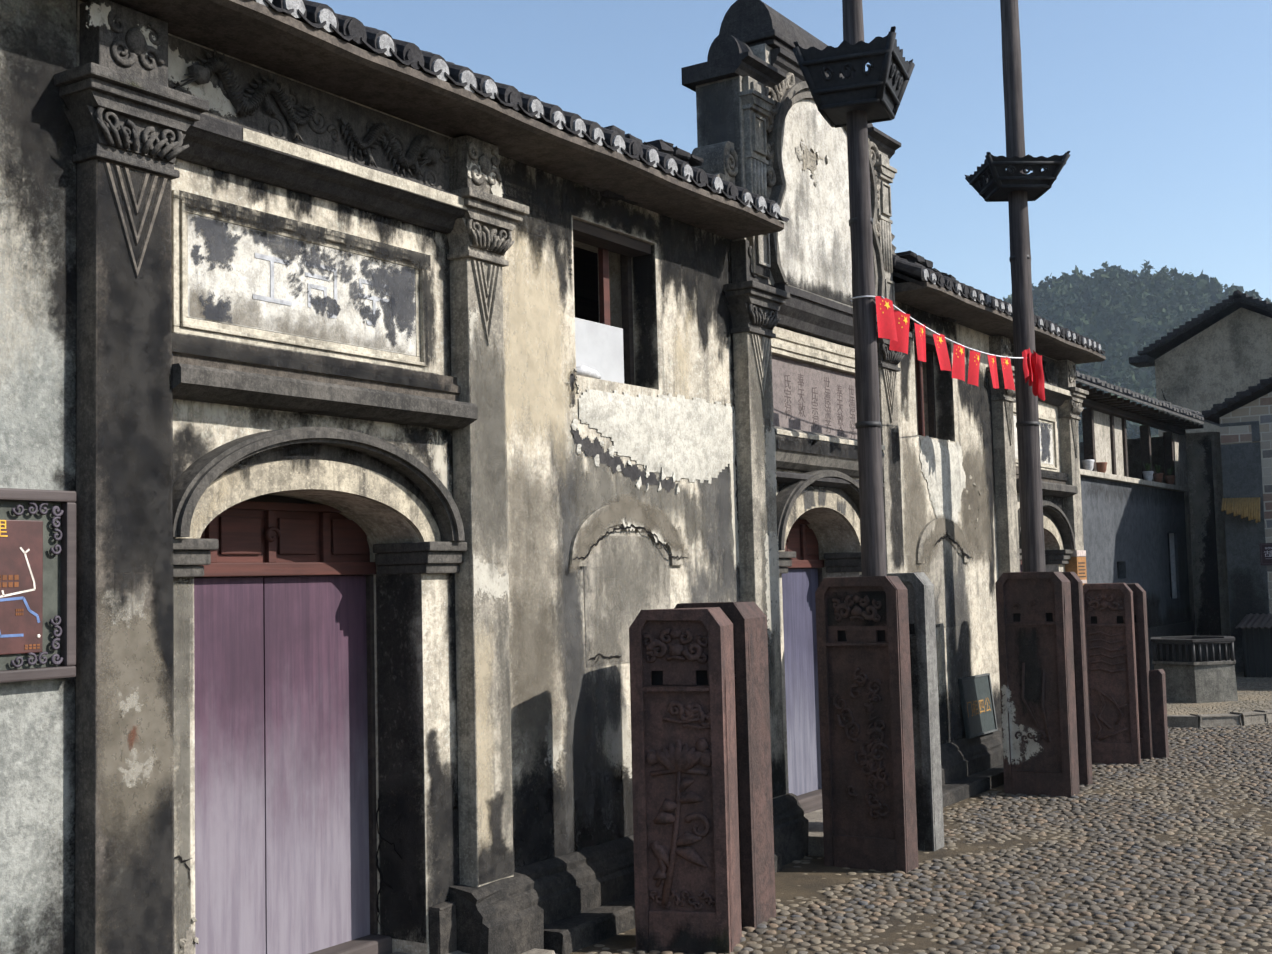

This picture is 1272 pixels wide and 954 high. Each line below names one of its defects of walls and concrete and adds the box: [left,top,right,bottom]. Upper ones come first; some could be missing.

water stain [85,2,114,30]
water stain [138,24,237,117]
water stain [0,6,77,459]
flaking render [566,368,680,494]
water stain [750,335,858,492]
water stain [97,160,460,954]
water stain [466,155,740,885]
water stain [762,508,781,706]
water stain [881,303,996,744]
water stain [0,812,75,954]
water stain [771,753,786,798]
water stain [915,773,933,851]